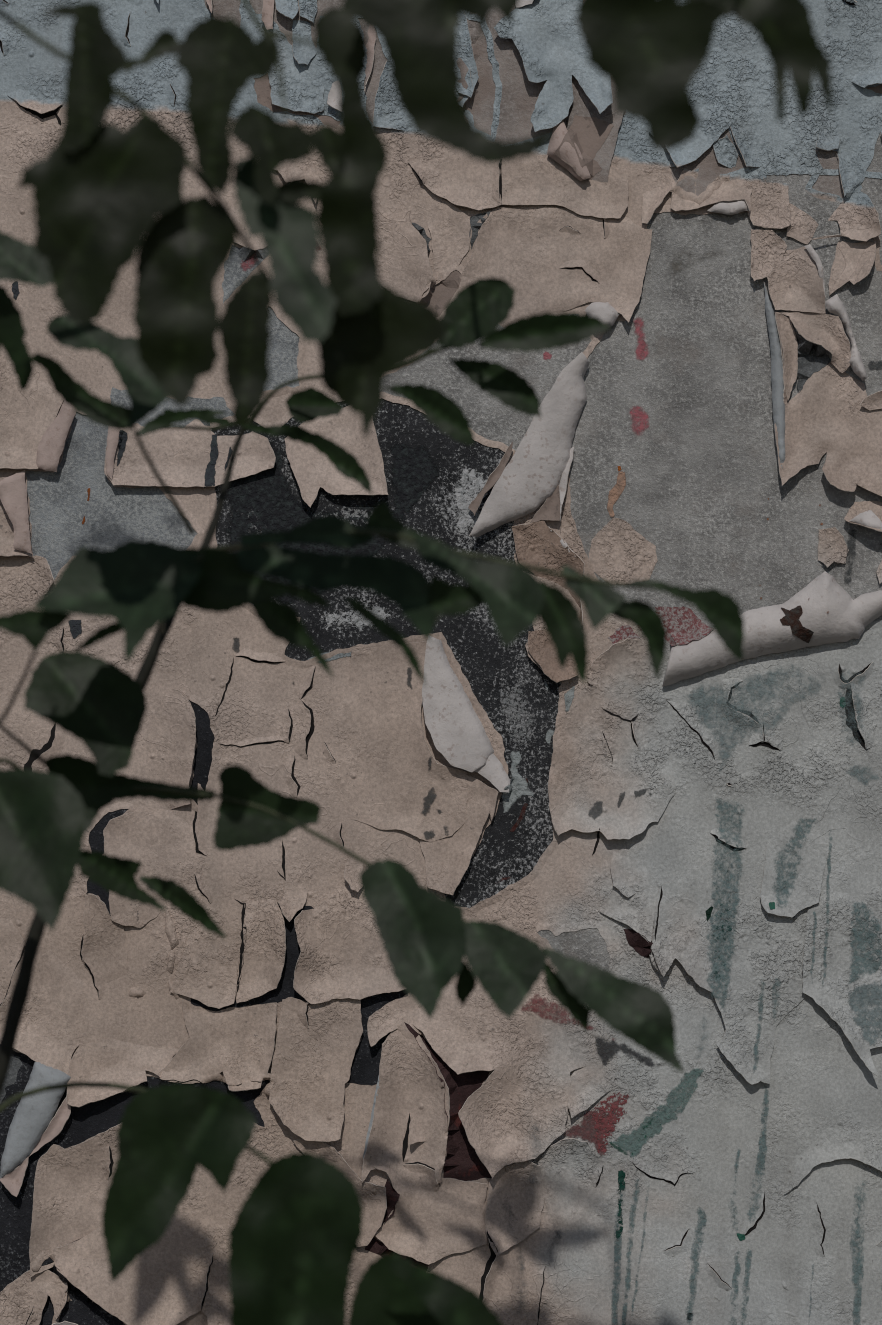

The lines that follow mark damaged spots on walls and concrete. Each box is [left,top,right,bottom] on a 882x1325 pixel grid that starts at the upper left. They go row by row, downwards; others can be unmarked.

peeling [0,0,882,687]
crack [215,638,336,797]
crack [333,822,344,847]
peeling [254,573,882,1085]
peeling [0,686,654,1325]
damp [755,1092,769,1175]
damp [612,1170,648,1325]
damp [687,1209,706,1323]
damp [731,1195,758,1325]
damp [850,1189,865,1325]